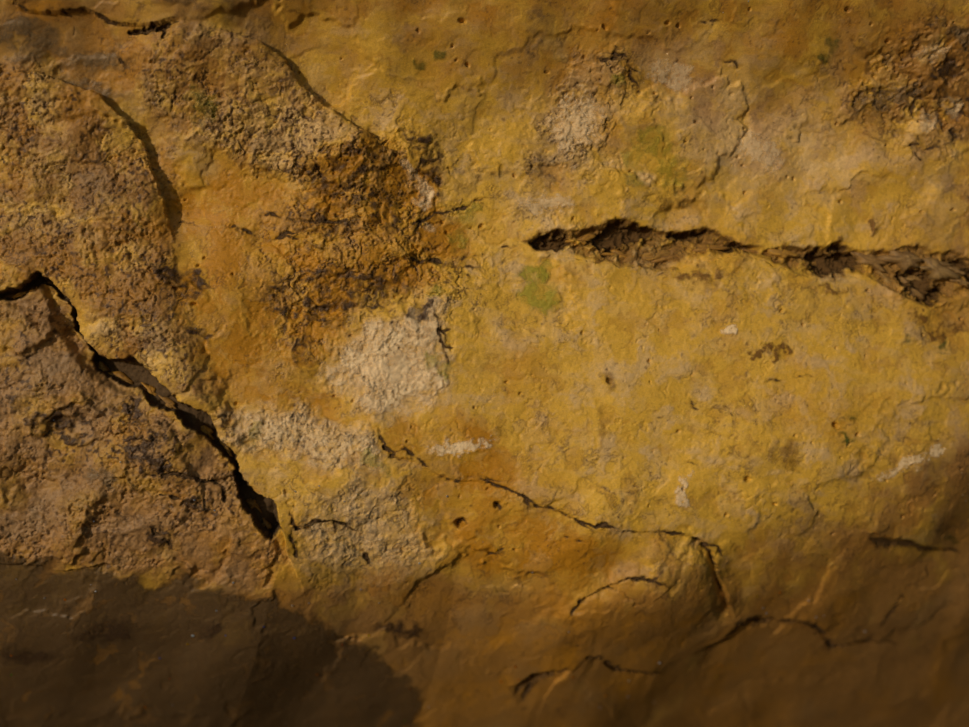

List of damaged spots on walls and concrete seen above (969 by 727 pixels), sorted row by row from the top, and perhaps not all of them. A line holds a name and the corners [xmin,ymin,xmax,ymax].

water stain [315,148,401,232]
water stain [403,131,443,210]
water stain [263,264,408,331]
water stain [406,299,433,322]
crack [151,528,172,549]
crack [160,469,226,504]
crack [379,430,727,603]
crack [571,571,668,615]